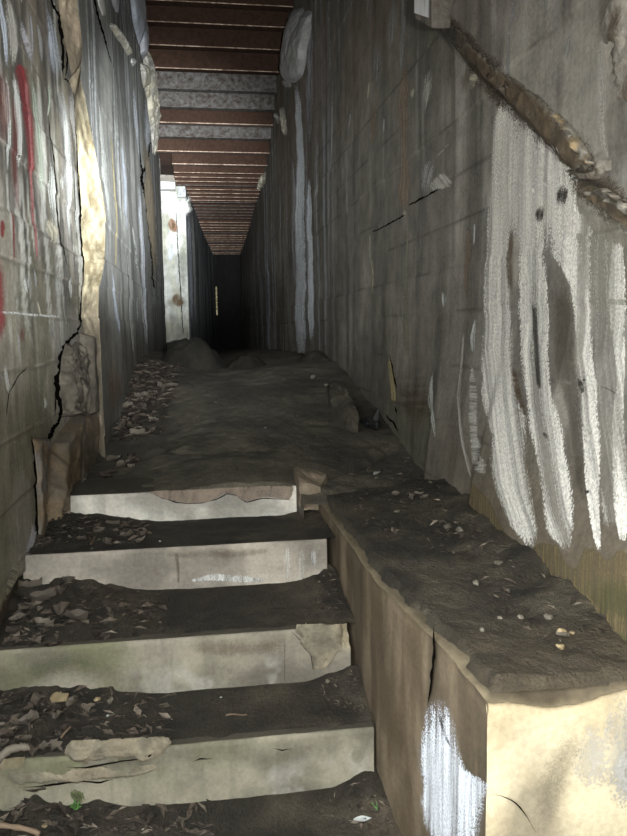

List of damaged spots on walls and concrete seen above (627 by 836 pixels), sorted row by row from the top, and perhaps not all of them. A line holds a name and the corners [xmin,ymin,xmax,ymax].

spalling [600,0,627,101]
spalling [436,17,627,235]
crack [31,0,84,535]
crack [373,187,442,232]
spalling [31,333,101,535]
leakage [457,103,627,642]
spalling [293,624,343,671]
crack [428,627,436,702]
spalling [8,736,172,788]
leakage [421,704,488,836]